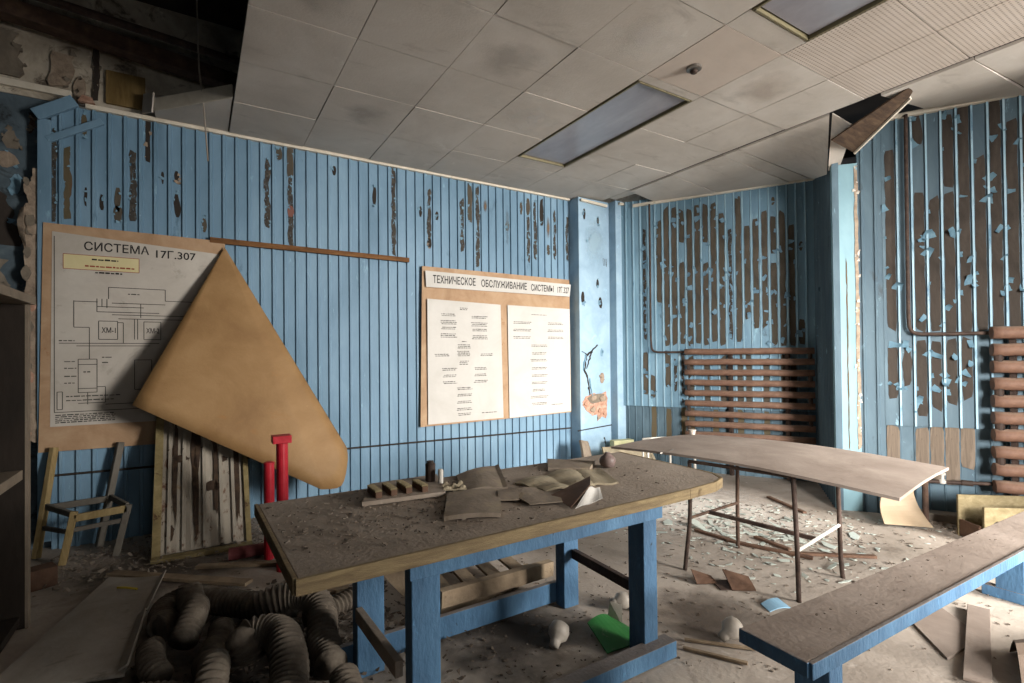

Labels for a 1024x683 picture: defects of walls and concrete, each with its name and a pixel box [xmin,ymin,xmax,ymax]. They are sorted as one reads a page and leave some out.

flaking render [0,28,27,78]
peeling [51,121,152,223]
peeling [159,171,181,217]
peeling [263,146,295,246]
peeling [418,189,438,248]
peeling [459,183,481,267]
peeling [519,198,569,264]
flaking render [0,112,37,443]
peeling [641,192,806,437]
peeling [882,100,1024,485]
crack [582,345,598,396]
flaking render [582,373,608,421]